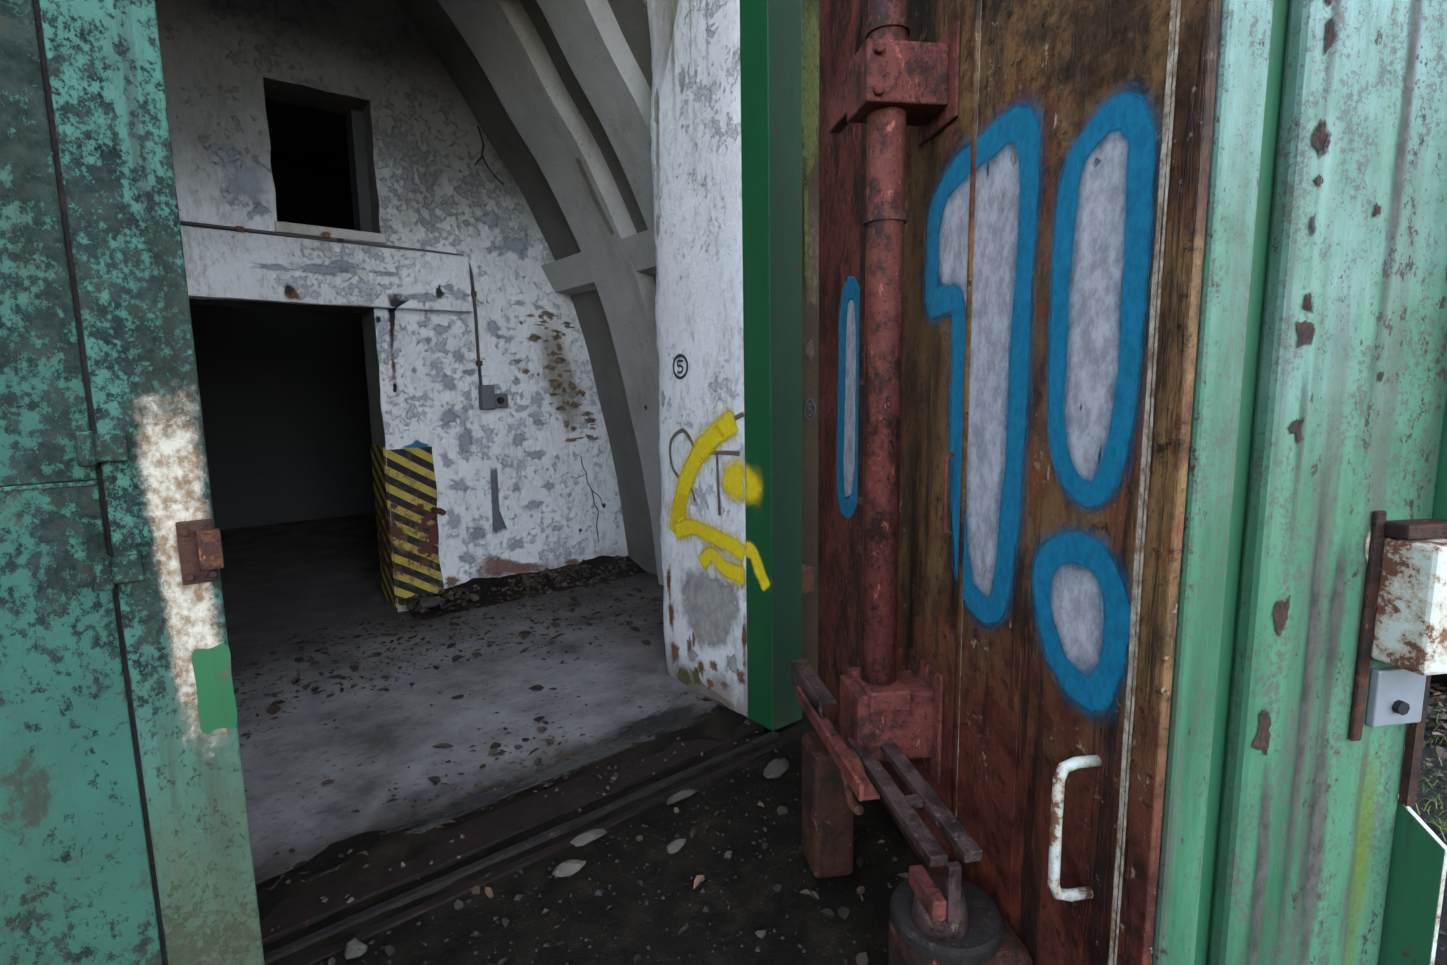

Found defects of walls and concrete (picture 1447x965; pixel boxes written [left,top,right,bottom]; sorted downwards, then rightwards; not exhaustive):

rust [1324,0,1337,55]
rust [1312,119,1332,187]
peeling [260,260,352,274]
peeling [418,321,449,342]
peeling [412,285,471,302]
rust [1296,293,1315,349]
peeling [443,350,474,389]
peeling [488,301,598,442]
peeling [442,410,471,490]
peeling [514,434,544,459]
rust [1288,417,1305,443]
peeling [138,397,220,737]